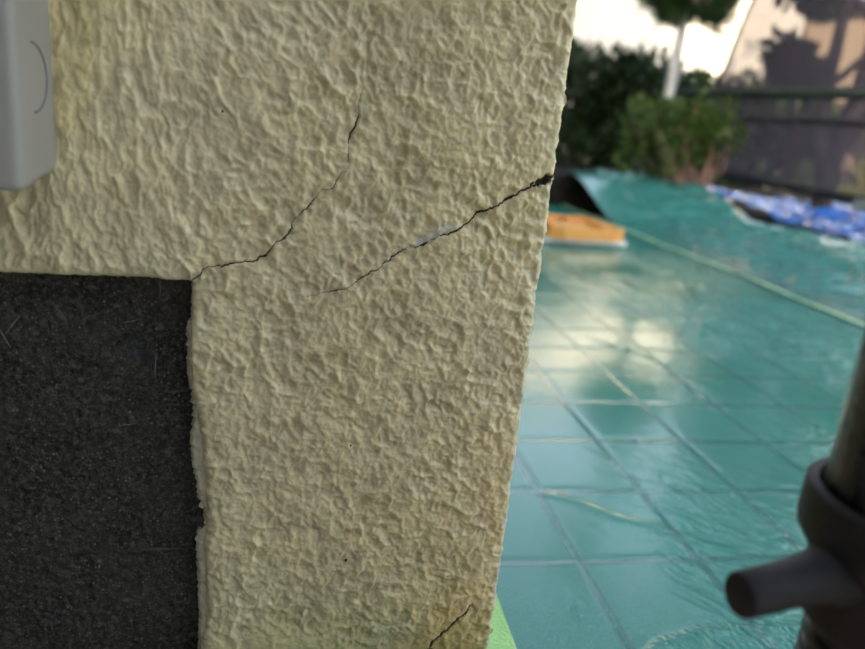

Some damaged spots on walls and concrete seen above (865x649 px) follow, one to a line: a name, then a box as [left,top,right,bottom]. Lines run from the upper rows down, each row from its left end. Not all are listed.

crack [191,89,363,282]
crack [311,180,539,296]
crack [428,605,471,649]